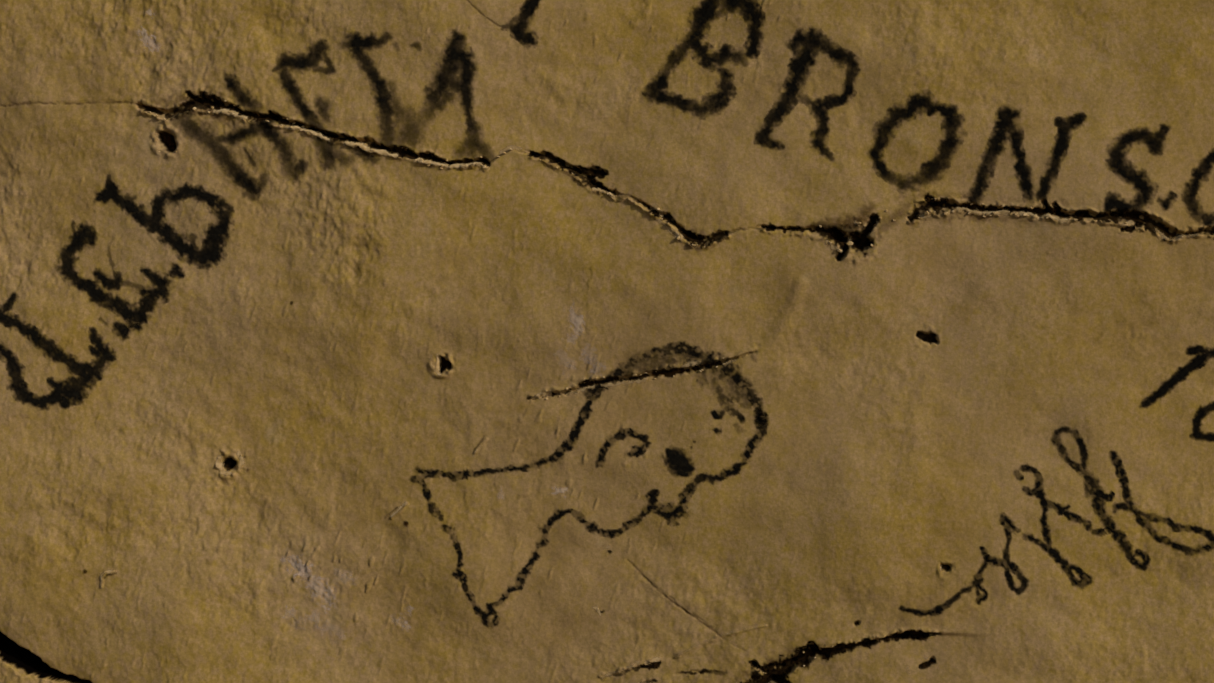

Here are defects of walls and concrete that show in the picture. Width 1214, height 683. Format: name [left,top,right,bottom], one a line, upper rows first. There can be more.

crack [113,90,728,248]
crack [908,193,1214,242]
crack [602,630,935,683]